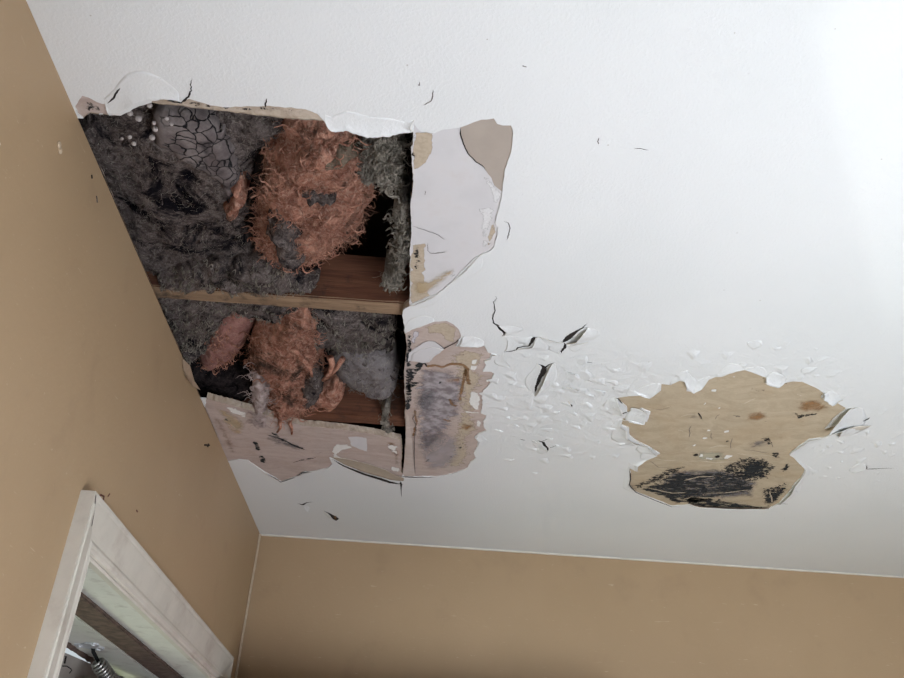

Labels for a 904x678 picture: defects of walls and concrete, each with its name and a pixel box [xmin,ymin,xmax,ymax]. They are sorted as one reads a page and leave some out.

peeling [75,96,108,117]
peeling [182,359,200,390]
peeling [205,118,513,496]
crack [492,296,599,396]
peeling [603,363,870,509]